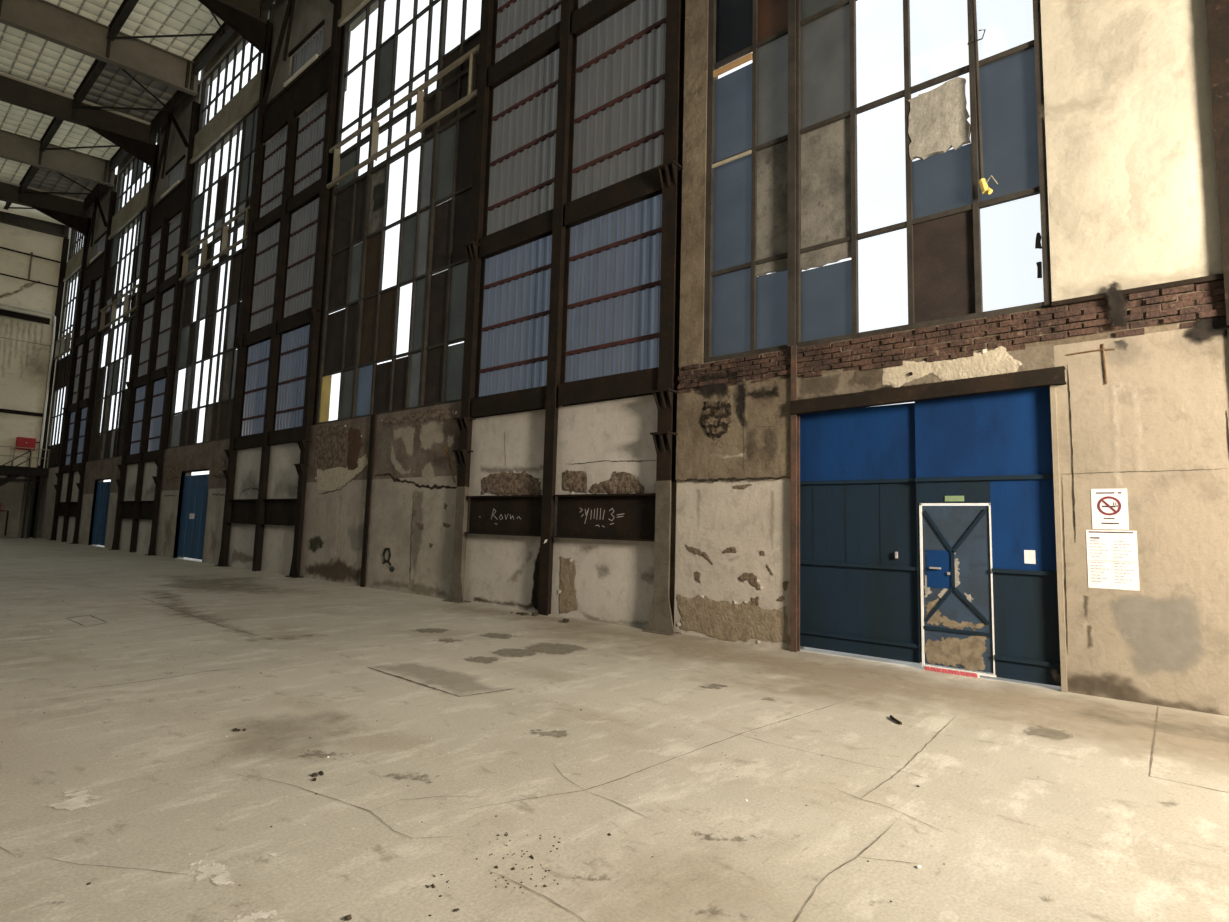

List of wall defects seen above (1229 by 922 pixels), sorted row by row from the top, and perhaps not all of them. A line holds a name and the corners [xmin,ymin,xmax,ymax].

flaking render [882,346,1022,387]
flaking render [315,427,368,491]
flaking render [391,422,454,482]
spalling [481,470,542,495]
spalling [562,470,644,494]
spalling [685,545,737,565]
flaking render [676,551,790,644]
crack [263,778,461,839]
crack [470,696,955,922]